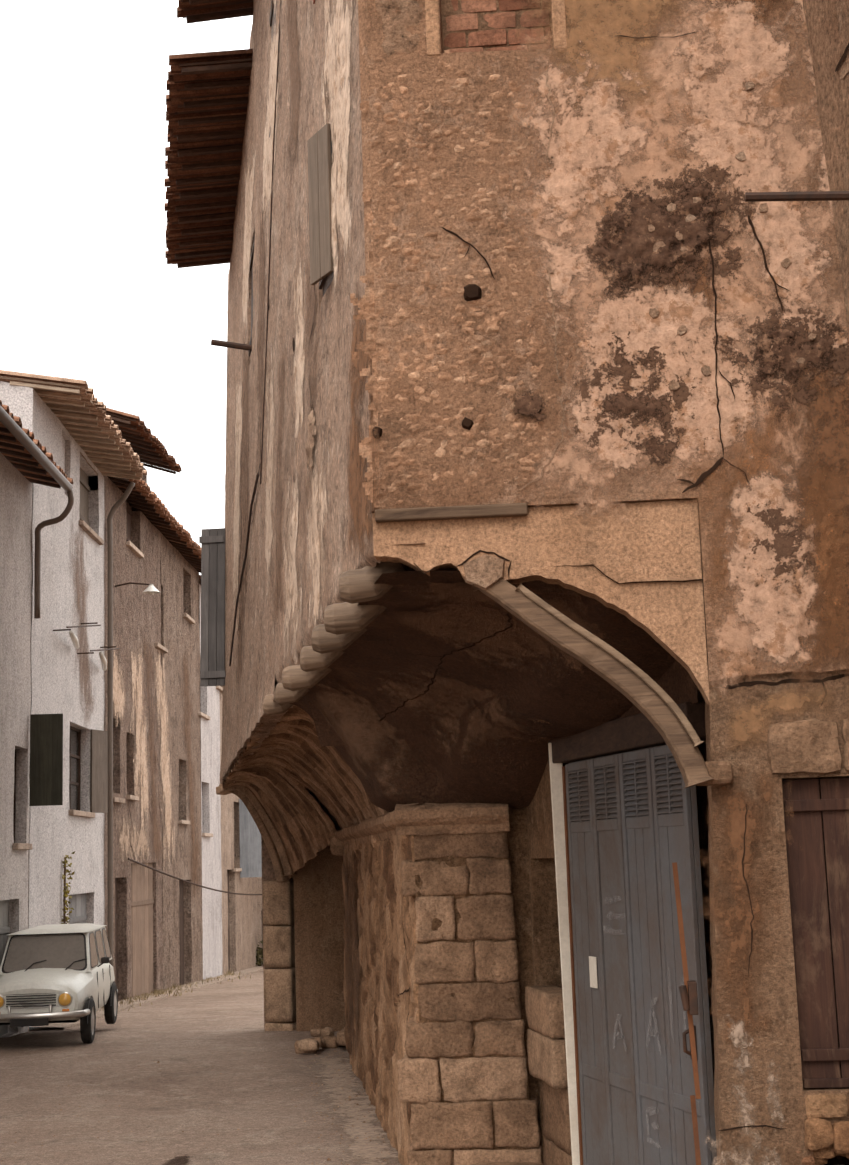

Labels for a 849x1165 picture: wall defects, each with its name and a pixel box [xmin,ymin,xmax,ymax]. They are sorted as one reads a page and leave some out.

crack [748,215,791,311]
peeling [501,0,849,687]
crack [677,241,751,493]
crack [379,612,513,721]
peeling [384,550,583,671]
spalling [795,1146,849,1165]